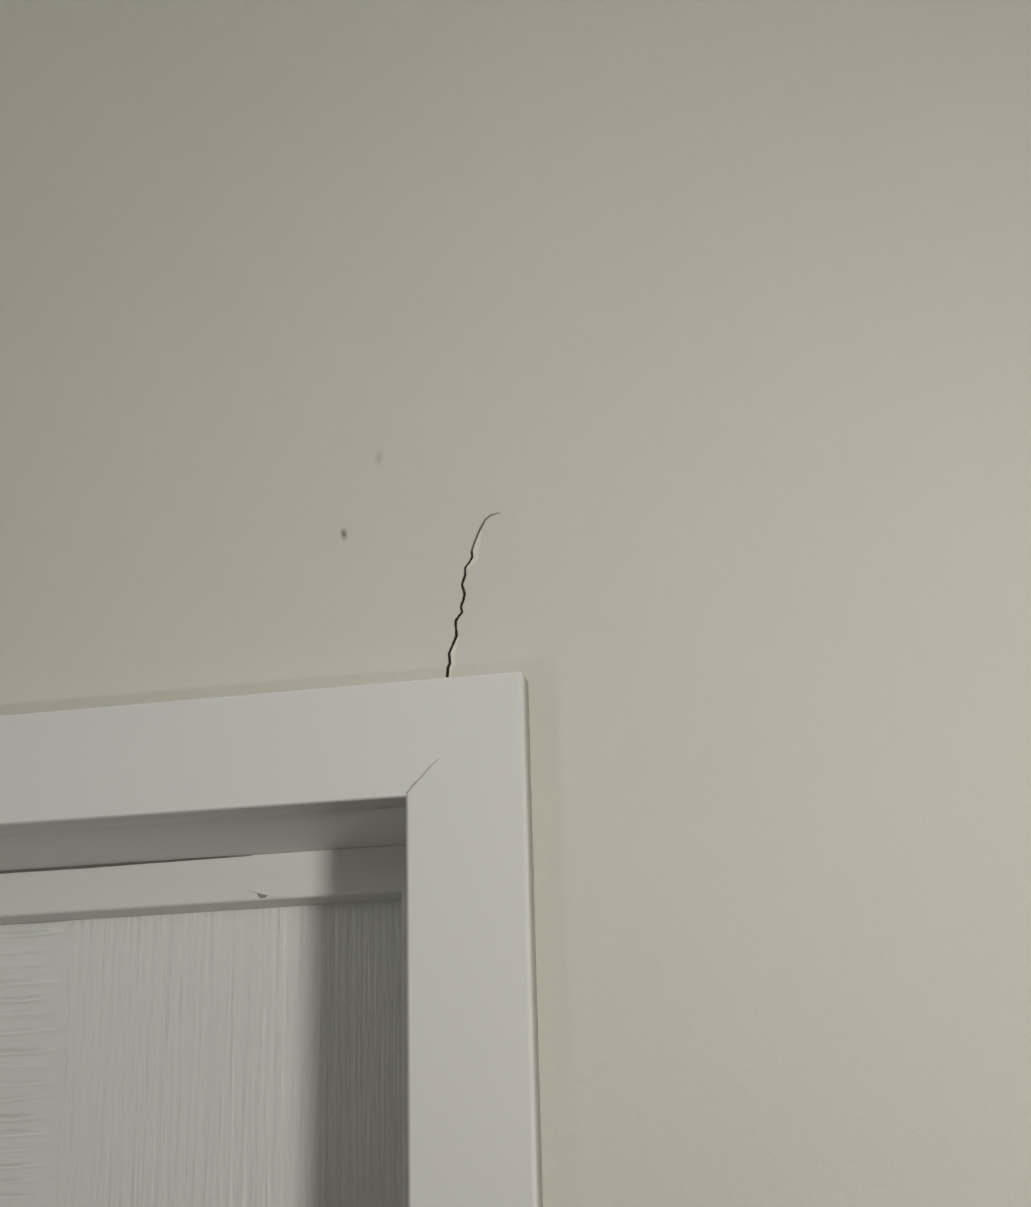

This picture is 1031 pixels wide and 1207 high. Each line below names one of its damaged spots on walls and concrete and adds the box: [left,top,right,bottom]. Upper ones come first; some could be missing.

crack [446,512,500,677]